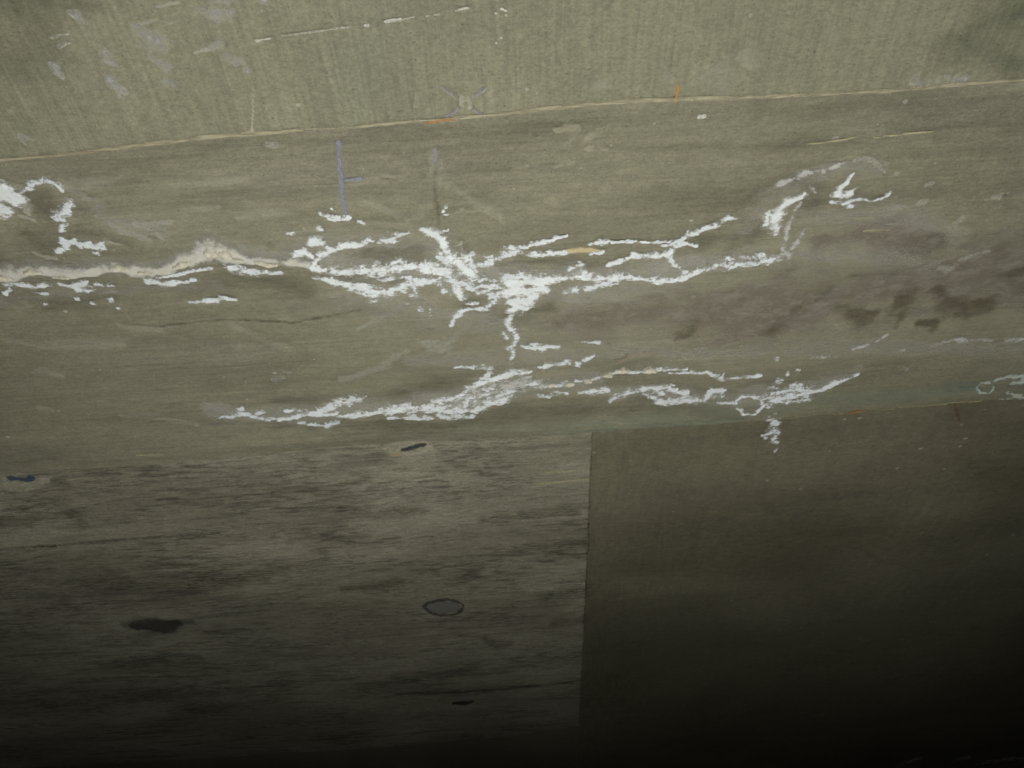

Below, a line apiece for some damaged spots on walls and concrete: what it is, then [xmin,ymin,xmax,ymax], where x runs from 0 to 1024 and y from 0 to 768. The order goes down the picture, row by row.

damp [0,157,1024,453]